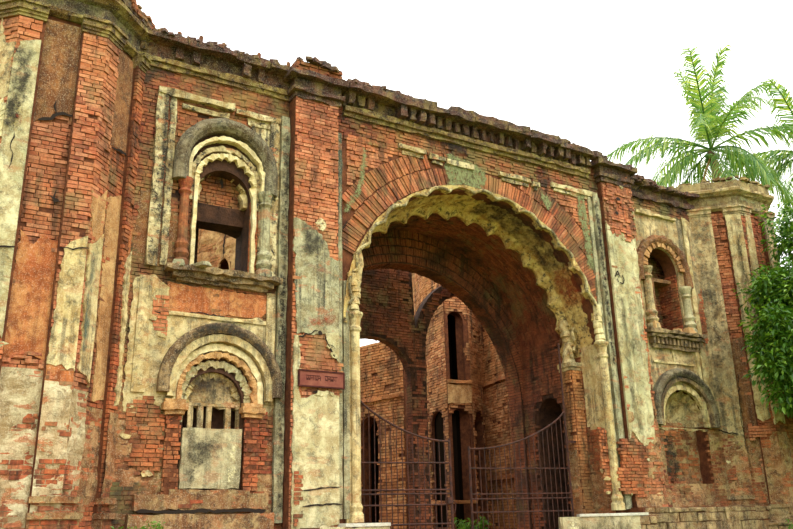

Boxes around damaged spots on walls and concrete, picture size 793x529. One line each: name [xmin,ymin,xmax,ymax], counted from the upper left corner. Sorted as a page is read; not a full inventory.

crack [38,100,73,120]
leakage [444,154,487,189]
leakage [303,218,328,254]
peeling [605,185,637,242]
leakage [193,132,290,484]
peeling [299,387,342,398]
peeling [0,341,248,529]
leakage [185,437,221,481]
peeling [257,410,273,513]
peeling [566,411,793,516]
spalling [293,471,303,526]